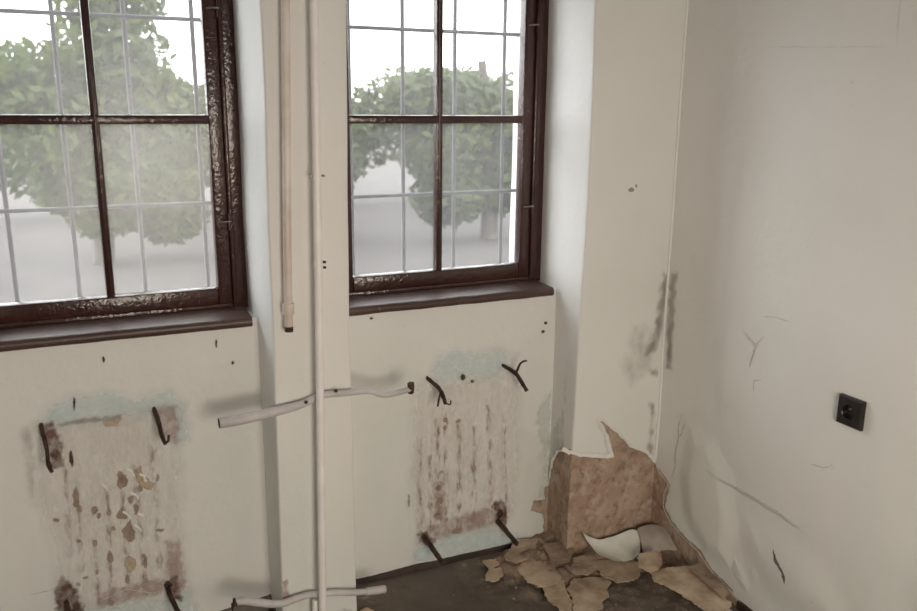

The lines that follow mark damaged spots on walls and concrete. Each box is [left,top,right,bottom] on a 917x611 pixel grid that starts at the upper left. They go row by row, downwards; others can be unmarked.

rust [46,423,62,469]
peeling [408,375,516,537]
peeling [43,407,184,608]
rust [494,501,507,524]
peeling [482,418,741,611]
crack [705,469,810,533]
rust [55,580,83,611]
crack [773,550,785,584]